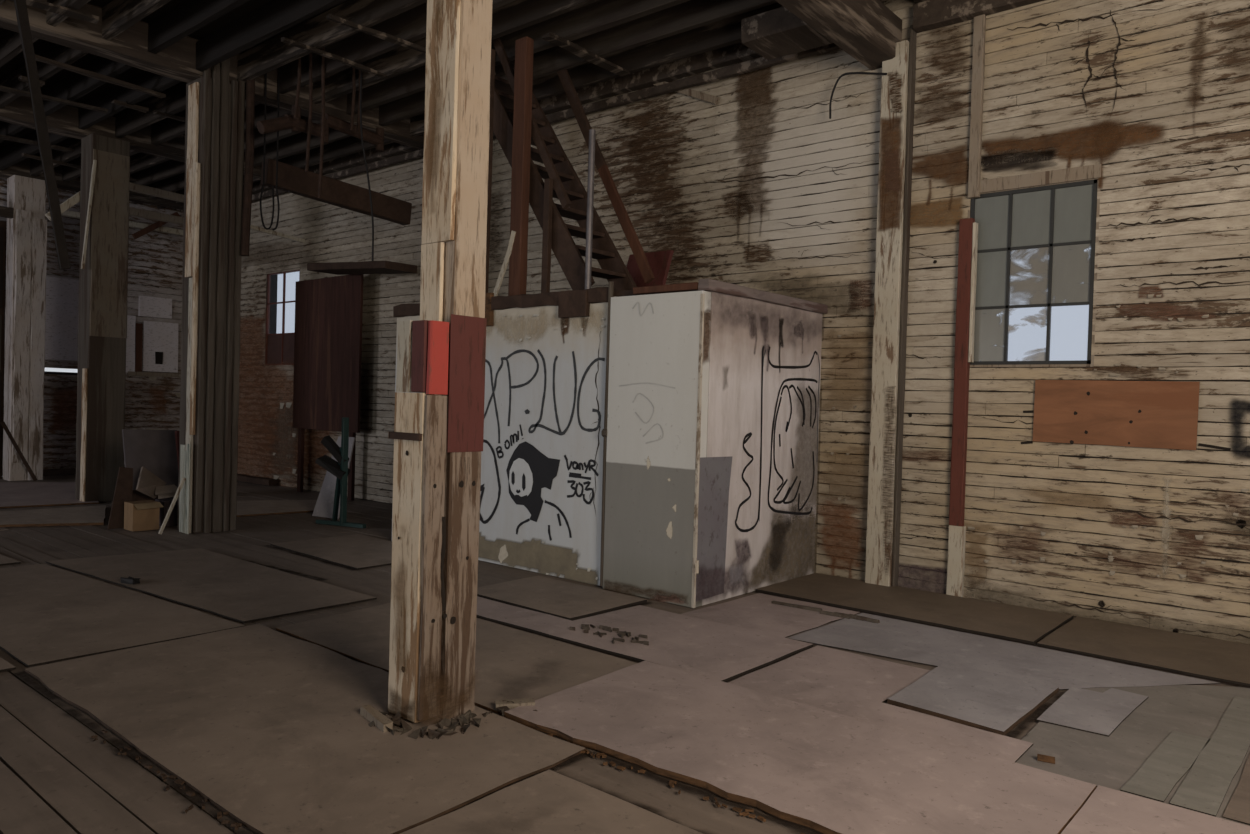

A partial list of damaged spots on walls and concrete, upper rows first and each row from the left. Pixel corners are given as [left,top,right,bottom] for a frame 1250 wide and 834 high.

crack [1009,5,1173,117]
water stain [722,56,776,253]
flaking render [478,532,598,585]